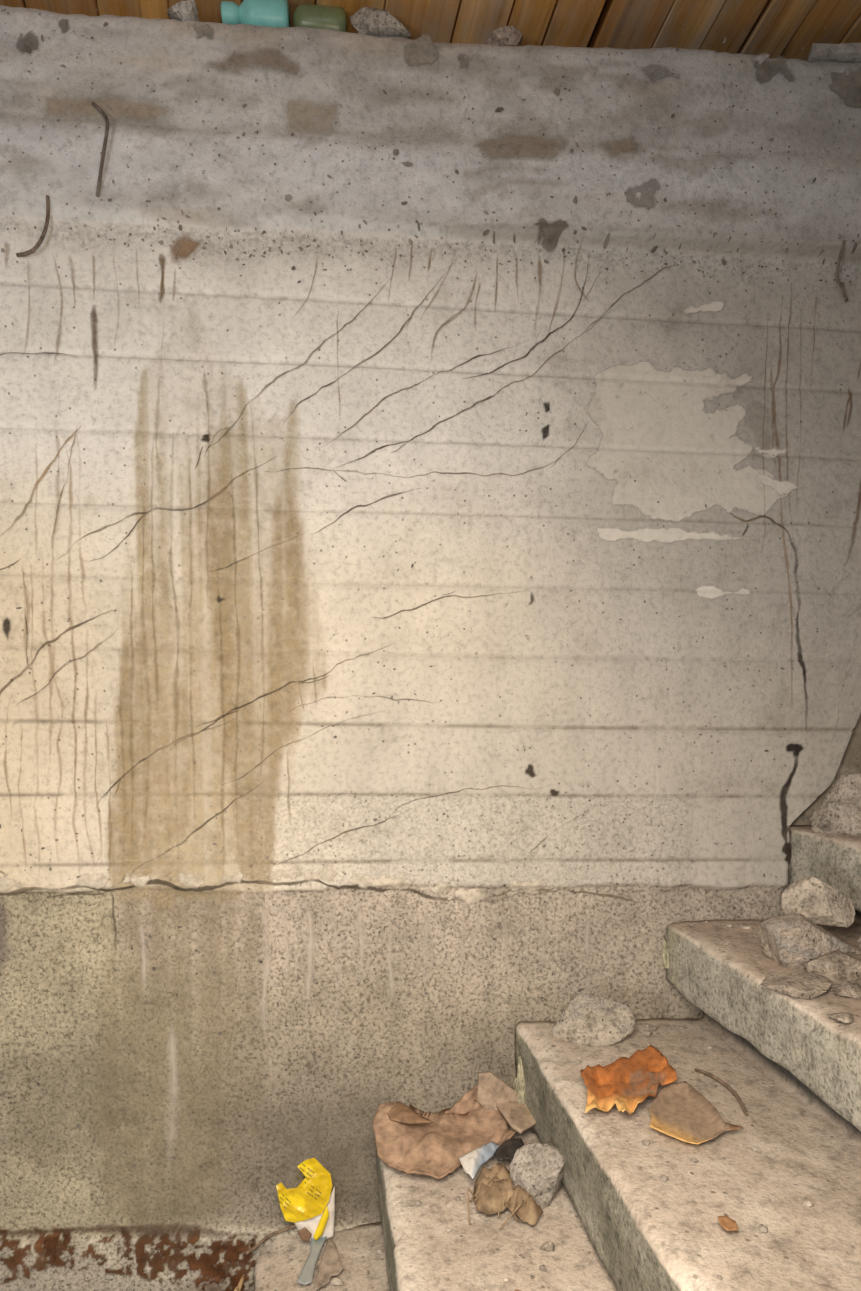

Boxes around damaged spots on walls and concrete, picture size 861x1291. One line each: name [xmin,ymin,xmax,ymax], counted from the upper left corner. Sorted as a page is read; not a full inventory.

crack [261,290,432,408]
crack [304,268,664,531]
peeling [586,361,798,543]
peeling [683,301,724,314]
crack [82,471,247,561]
peeling [695,586,750,599]
crack [0,617,96,699]
crack [796,614,807,696]
damp [117,466,252,1002]
crack [106,655,361,794]
crack [780,744,803,863]
corrosion [0,1226,256,1291]